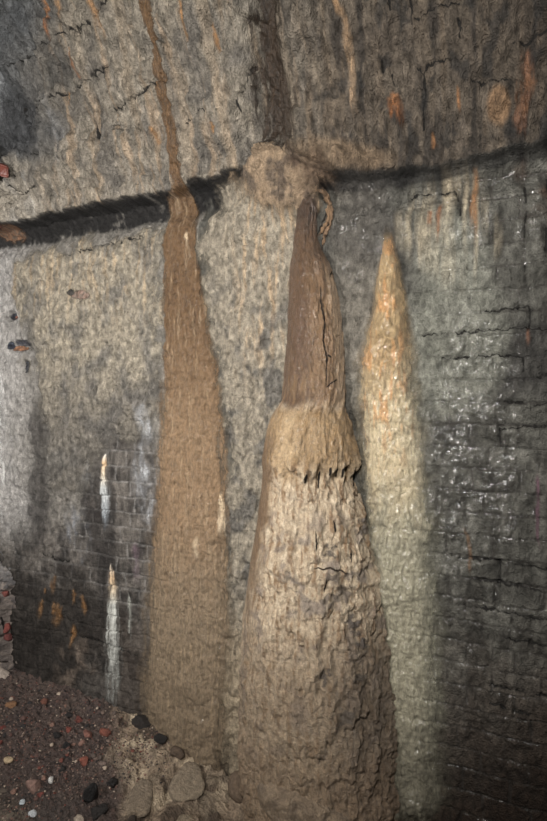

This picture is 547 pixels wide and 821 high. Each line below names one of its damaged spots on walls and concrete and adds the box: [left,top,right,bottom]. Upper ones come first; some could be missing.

leakage [194,181,297,778]
leakage [360,516,369,542]
corrosion [39,576,62,626]
leakage [319,573,351,609]
leakage [106,565,120,703]
leakage [347,614,367,649]